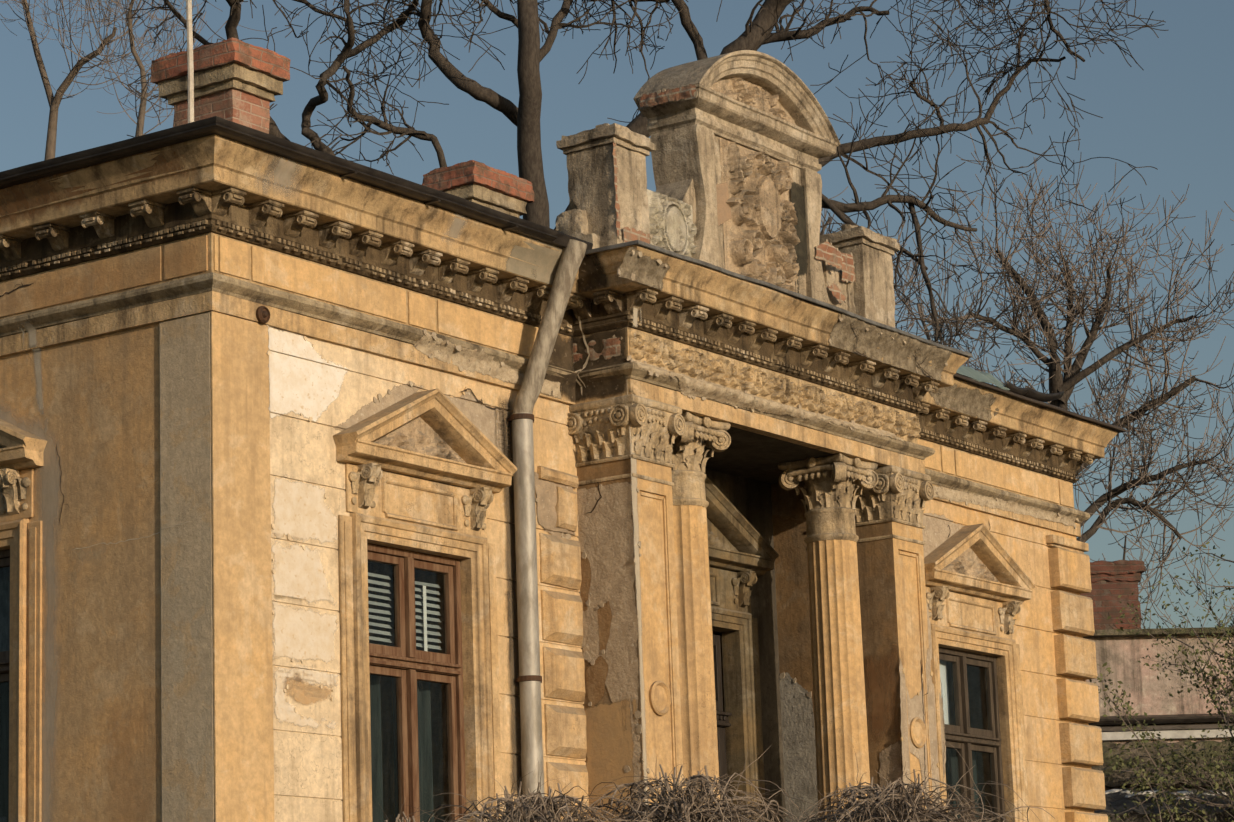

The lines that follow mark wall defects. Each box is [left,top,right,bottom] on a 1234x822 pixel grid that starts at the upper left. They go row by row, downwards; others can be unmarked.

peeling [266,325,347,422]
spalling [815,239,952,381]
peeling [271,476,338,729]
peeling [577,482,642,805]